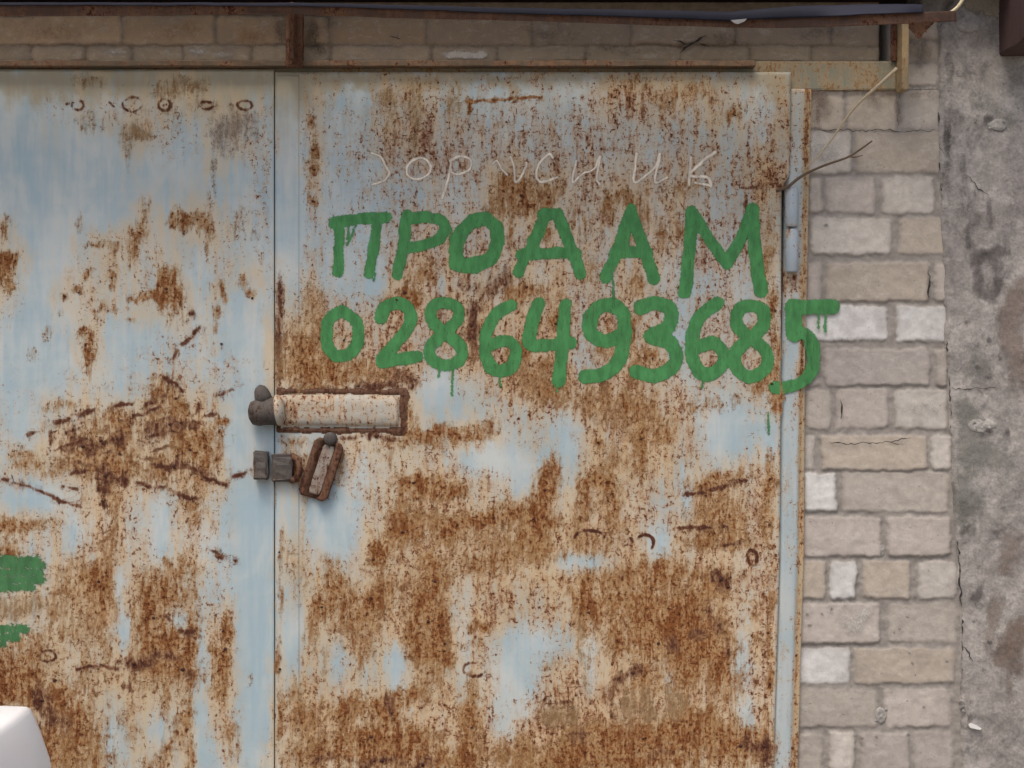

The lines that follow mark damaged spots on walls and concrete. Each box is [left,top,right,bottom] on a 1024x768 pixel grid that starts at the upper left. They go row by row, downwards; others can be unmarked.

corrosion [108,73,264,260]
corrosion [303,112,321,207]
corrosion [0,214,24,297]
corrosion [75,200,153,268]
corrosion [77,262,187,384]
corrosion [377,256,441,309]
corrosion [483,172,685,288]
corrosion [745,204,786,425]
crack [834,437,907,445]
corrosion [0,375,237,768]
corrosion [274,264,780,768]
crack [957,542,973,679]